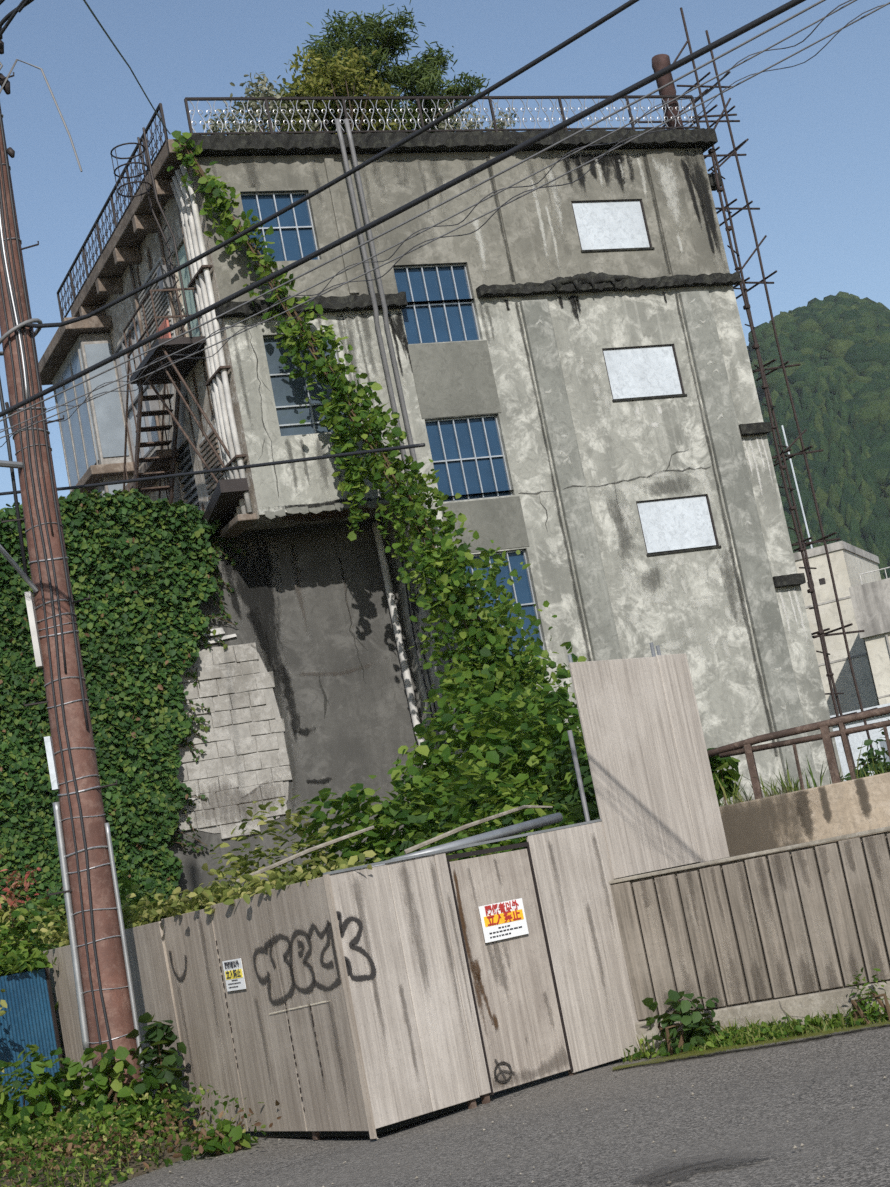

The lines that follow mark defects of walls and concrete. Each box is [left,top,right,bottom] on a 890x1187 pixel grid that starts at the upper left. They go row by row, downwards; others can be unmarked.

damp [474,220,485,261]
damp [531,171,562,255]
damp [559,152,669,270]
damp [681,155,720,253]
crack [519,450,711,532]
damp [646,787,831,876]
damp [855,778,871,815]
rust [454,871,498,1029]